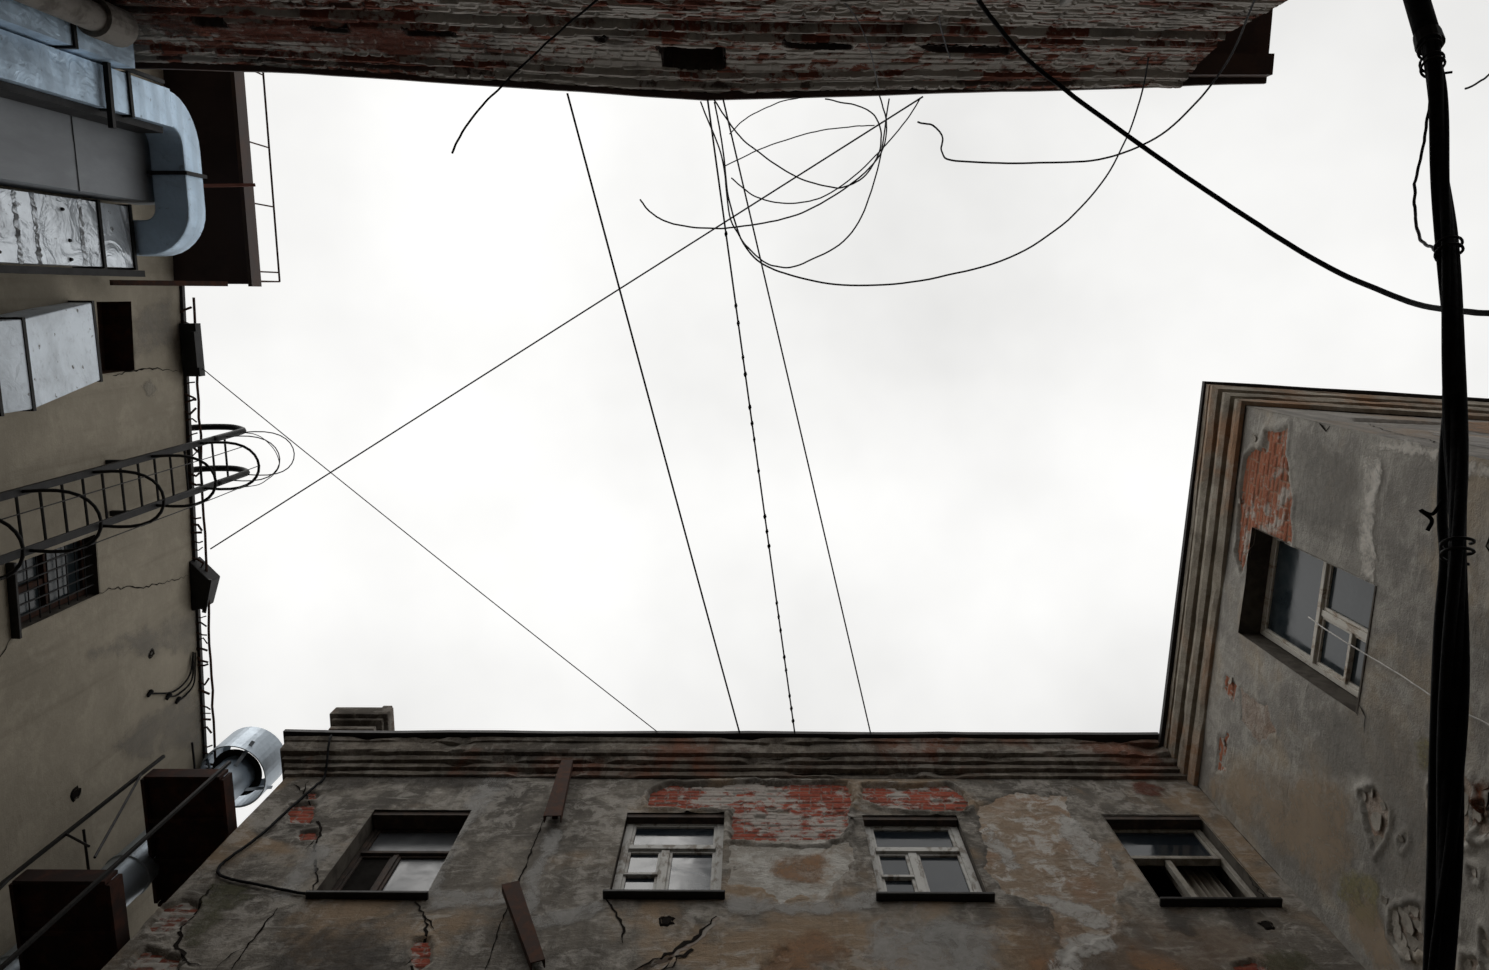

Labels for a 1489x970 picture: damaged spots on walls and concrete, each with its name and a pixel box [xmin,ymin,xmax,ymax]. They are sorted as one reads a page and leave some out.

spalling [656,46,726,71]
spalling [782,38,852,50]
spalling [918,43,1014,55]
flaking render [1237,428,1293,572]
peeling [1361,789,1406,847]
spalling [1464,777,1489,841]
peeling [648,783,1125,968]
crack [406,901,434,970]
crack [605,898,720,970]